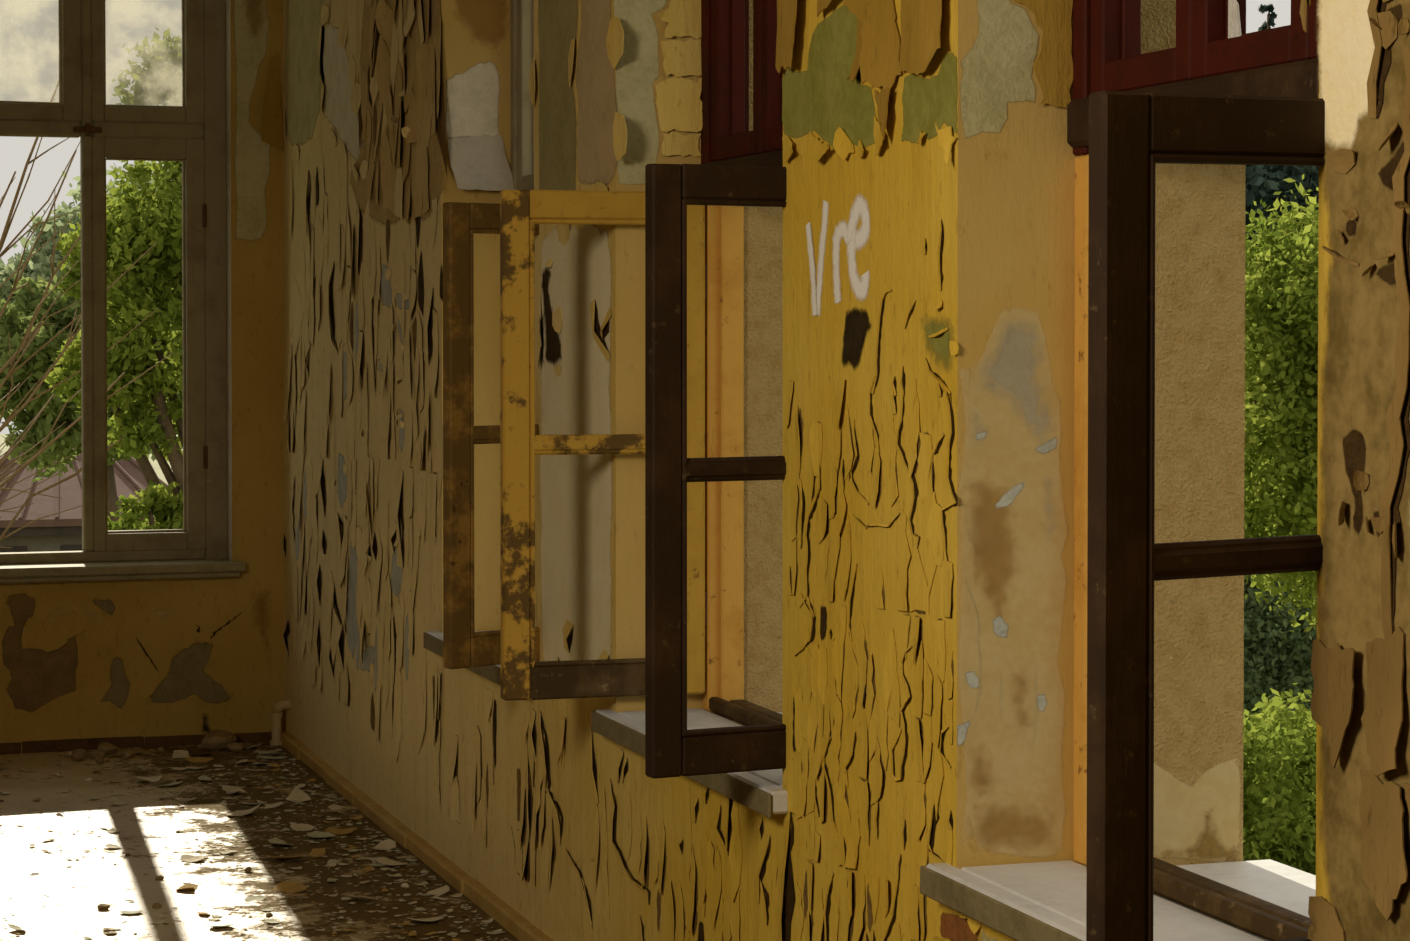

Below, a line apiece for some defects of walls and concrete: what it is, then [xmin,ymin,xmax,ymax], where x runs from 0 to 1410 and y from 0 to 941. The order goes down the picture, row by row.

peeling [529,0,702,191]
peeling [775,0,1073,166]
peeling [1300,0,1410,174]
flaking render [1378,123,1410,214]
flaking render [1362,252,1396,284]
peeling [234,0,514,847]
flaking render [0,585,234,720]
peeling [507,703,565,891]
crack [528,708,593,929]
peeling [589,784,609,920]
crack [589,729,650,941]
crack [677,646,952,941]